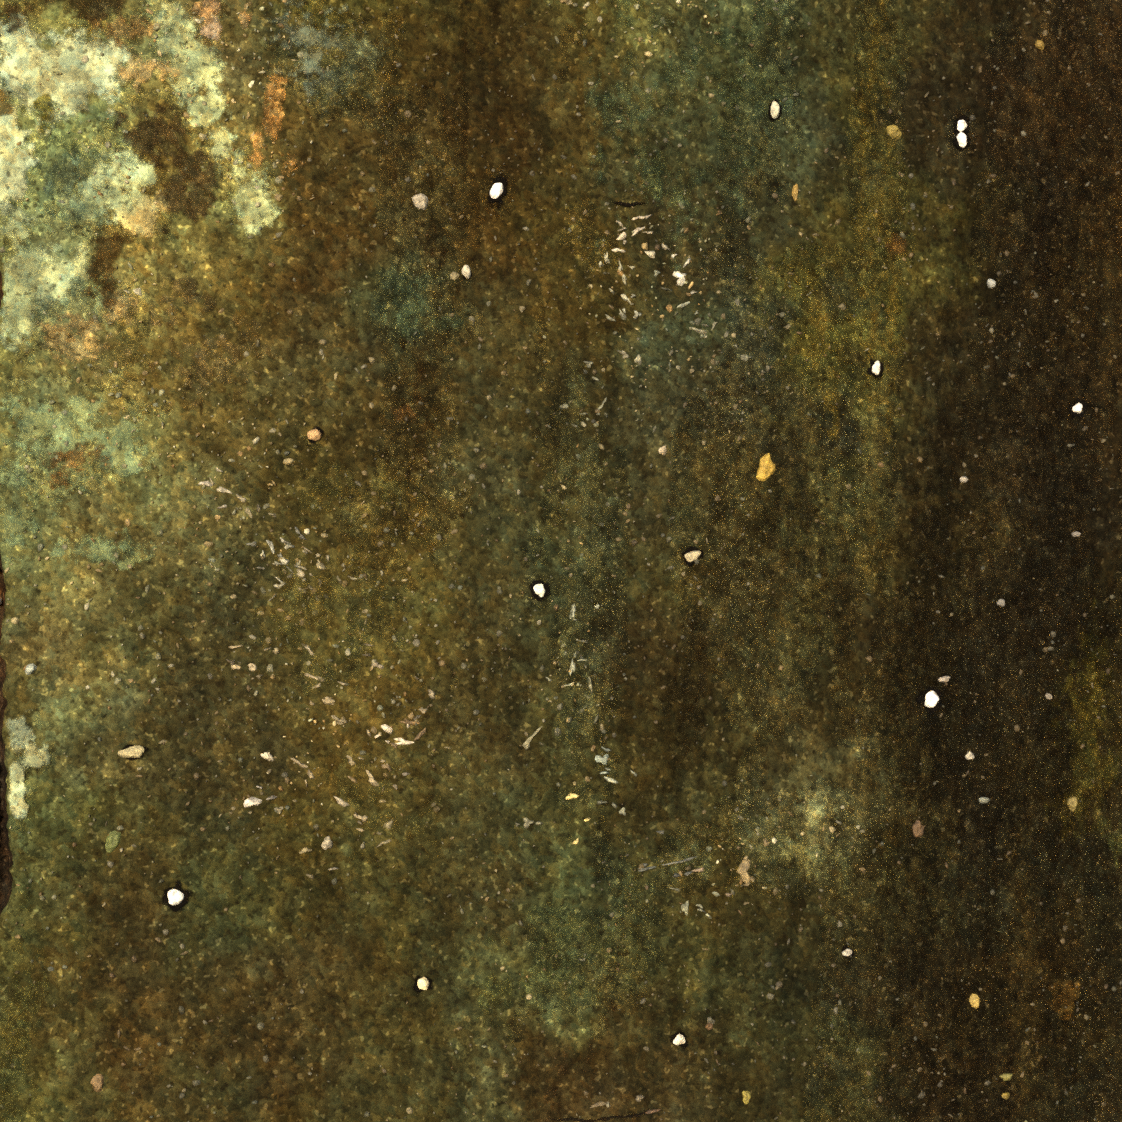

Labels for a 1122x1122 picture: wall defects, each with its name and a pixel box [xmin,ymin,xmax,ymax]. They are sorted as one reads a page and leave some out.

rust [0,90,13,115]
crack [0,271,8,307]
crack [0,552,13,915]